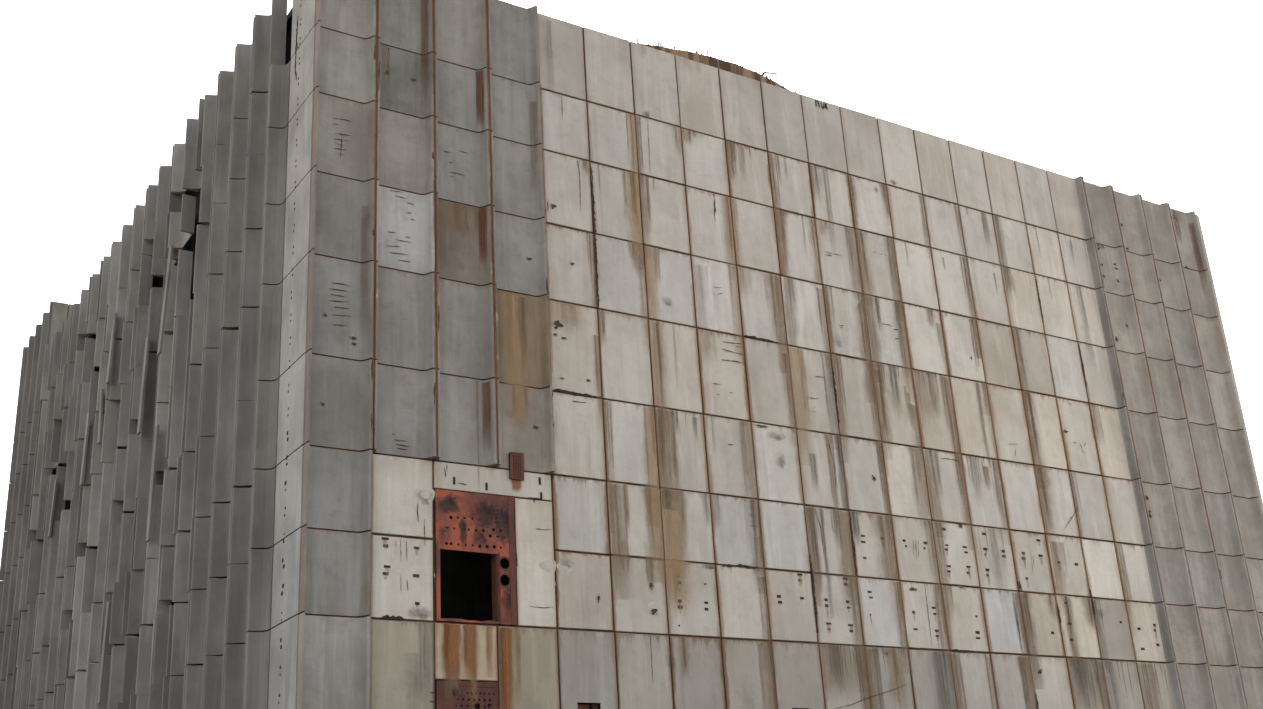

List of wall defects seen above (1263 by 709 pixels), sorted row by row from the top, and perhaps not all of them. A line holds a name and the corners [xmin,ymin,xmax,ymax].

corrosion [476,62,499,461]
corrosion [444,624,475,680]